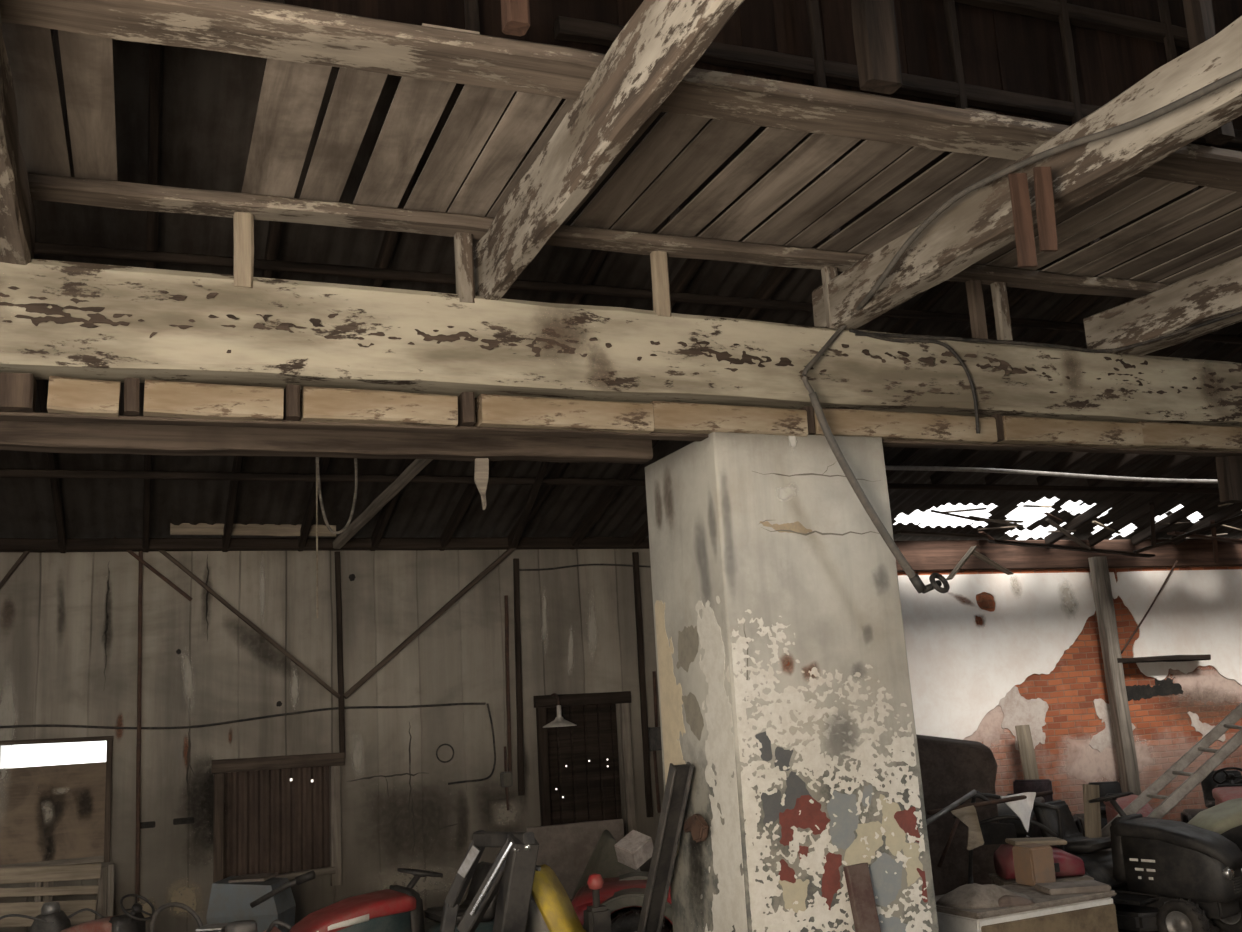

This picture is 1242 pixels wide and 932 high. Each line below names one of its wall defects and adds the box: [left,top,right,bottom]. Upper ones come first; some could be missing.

peeling [0,286,144,328]
peeling [149,314,239,338]
peeling [253,313,612,357]
peeling [675,341,826,374]
peeling [836,344,1061,376]
peeling [1097,357,1148,386]
crack [753,464,881,482]
crack [759,520,879,536]
peeling [1109,569,1242,701]
peeling [1089,699,1116,752]
peeling [1188,711,1225,742]
peeling [655,572,1096,932]